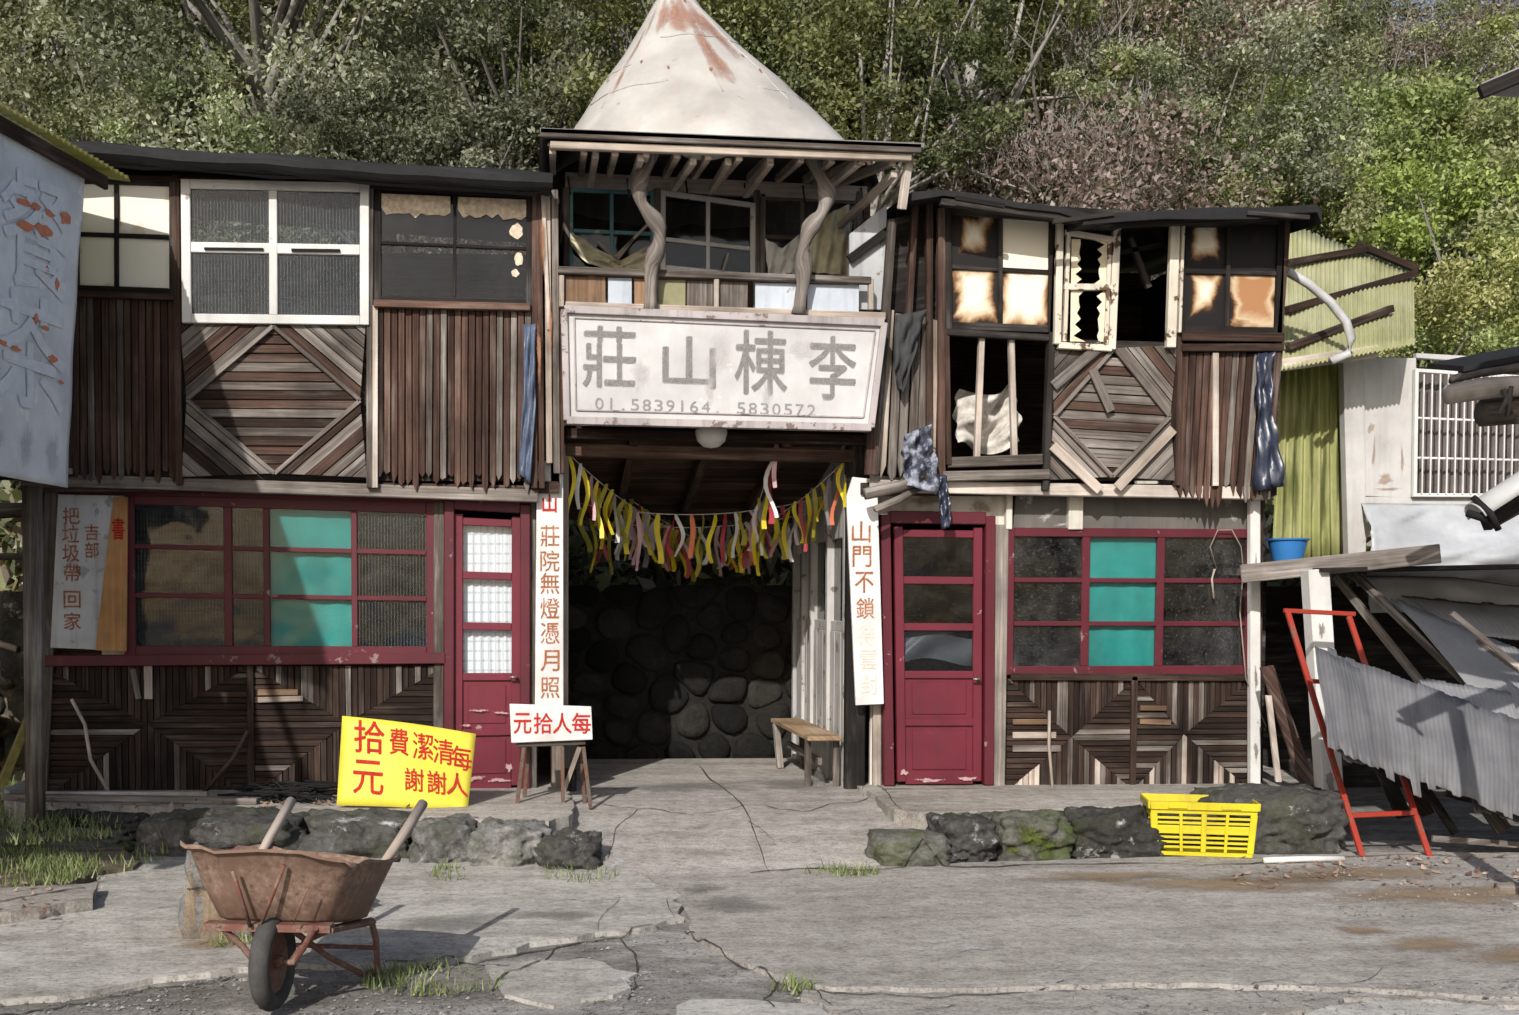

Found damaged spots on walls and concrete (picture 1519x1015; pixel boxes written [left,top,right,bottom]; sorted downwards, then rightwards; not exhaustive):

rust [606,0,744,83]
crack [594,767,1261,873]
crack [352,896,1519,1015]